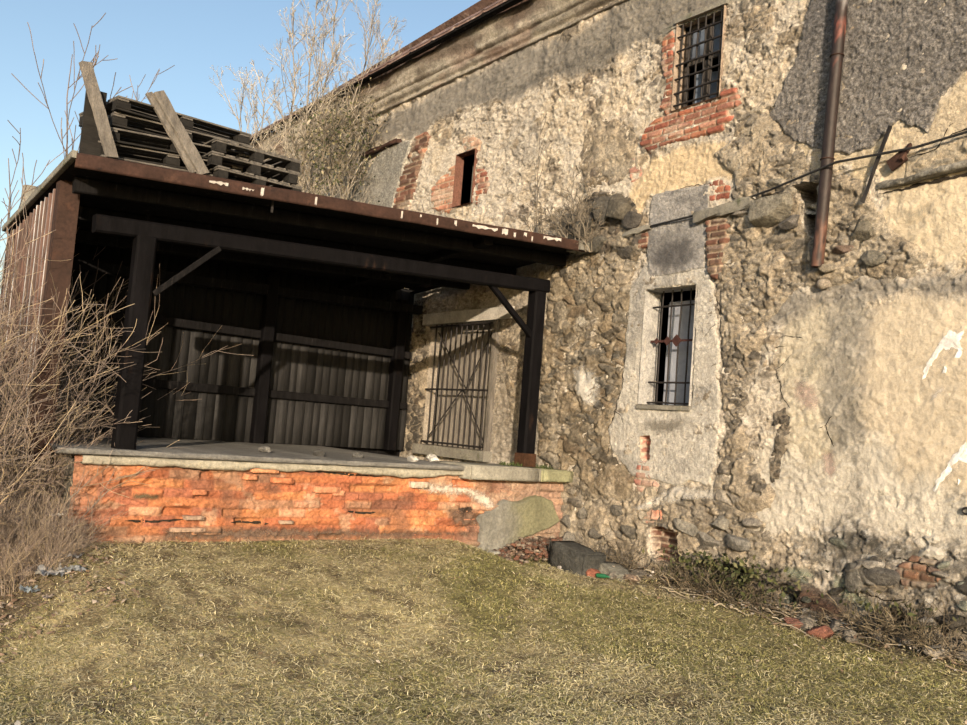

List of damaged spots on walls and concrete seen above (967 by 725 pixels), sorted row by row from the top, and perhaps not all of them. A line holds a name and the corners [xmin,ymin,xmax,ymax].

spalling [463,135,482,155]
spalling [431,165,455,214]
spalling [475,169,490,205]
spalling [537,5,967,652]